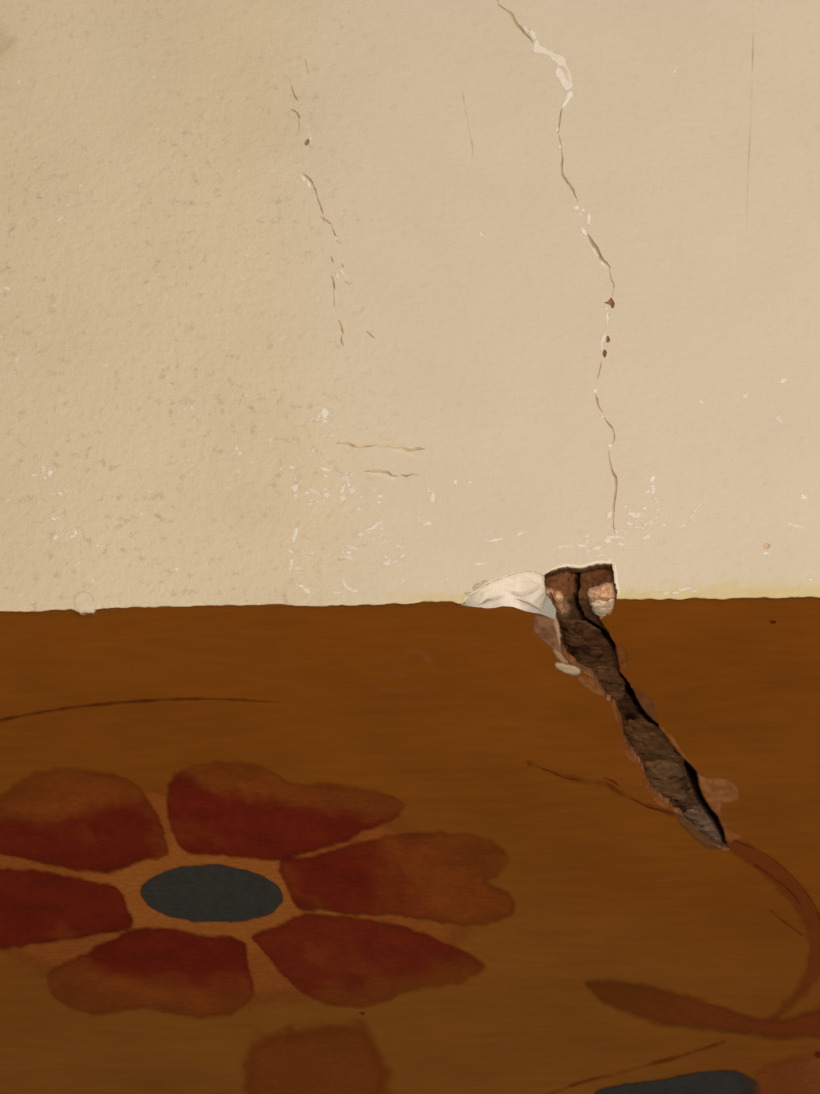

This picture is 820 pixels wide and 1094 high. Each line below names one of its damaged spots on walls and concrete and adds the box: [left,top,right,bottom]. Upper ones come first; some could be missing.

crack [497,0,535,43]
crack [555,109,618,533]
spalling [461,570,556,620]